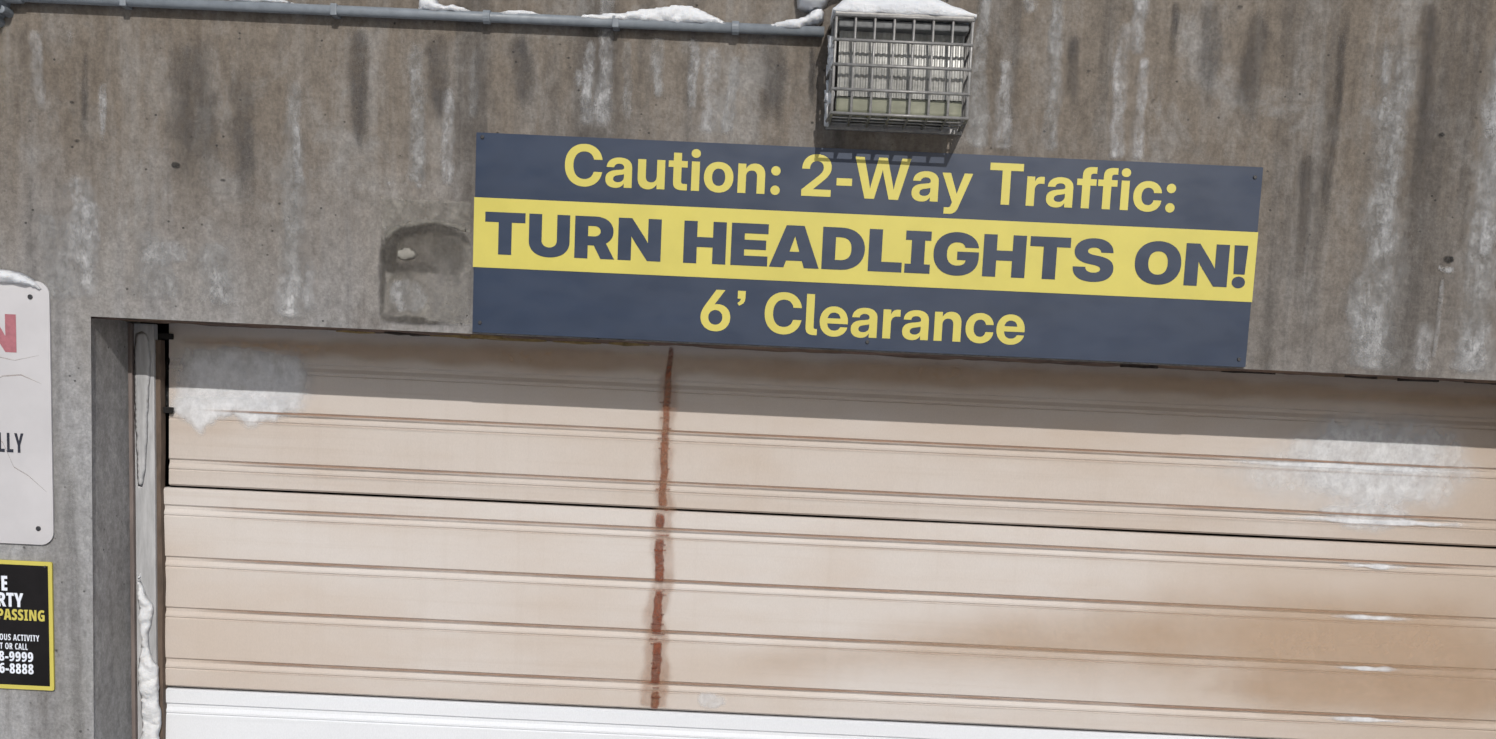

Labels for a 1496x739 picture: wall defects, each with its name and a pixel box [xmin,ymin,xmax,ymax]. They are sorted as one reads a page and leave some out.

water stain [1135,0,1147,44]
water stain [583,52,609,120]
water stain [972,0,1010,146]
water stain [50,181,92,294]
water stain [282,219,310,317]
water stain [1351,62,1411,366]
water stain [1469,212,1496,298]
water stain [1462,333,1484,371]
corrosion [234,348,1461,720]